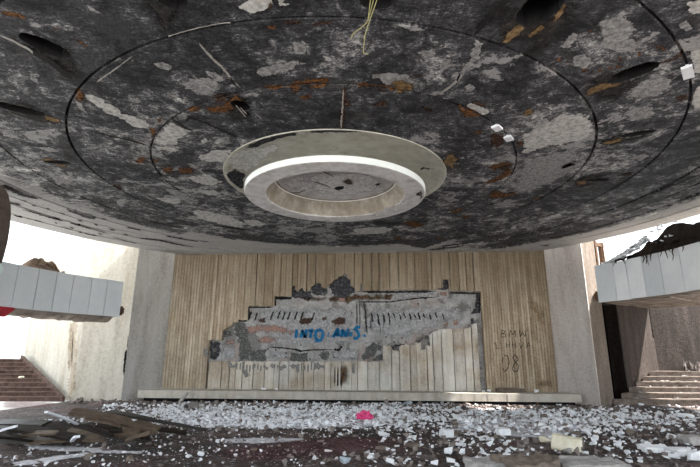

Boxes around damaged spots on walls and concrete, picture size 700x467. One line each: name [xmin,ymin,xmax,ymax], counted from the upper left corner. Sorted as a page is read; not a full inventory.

corrosion [501,25,546,43]
peeling [180,70,225,95]
corrosion [358,73,423,93]
corrosion [586,83,620,96]
peeling [75,95,190,154]
peeling [497,113,593,207]
peeling [203,276,481,377]